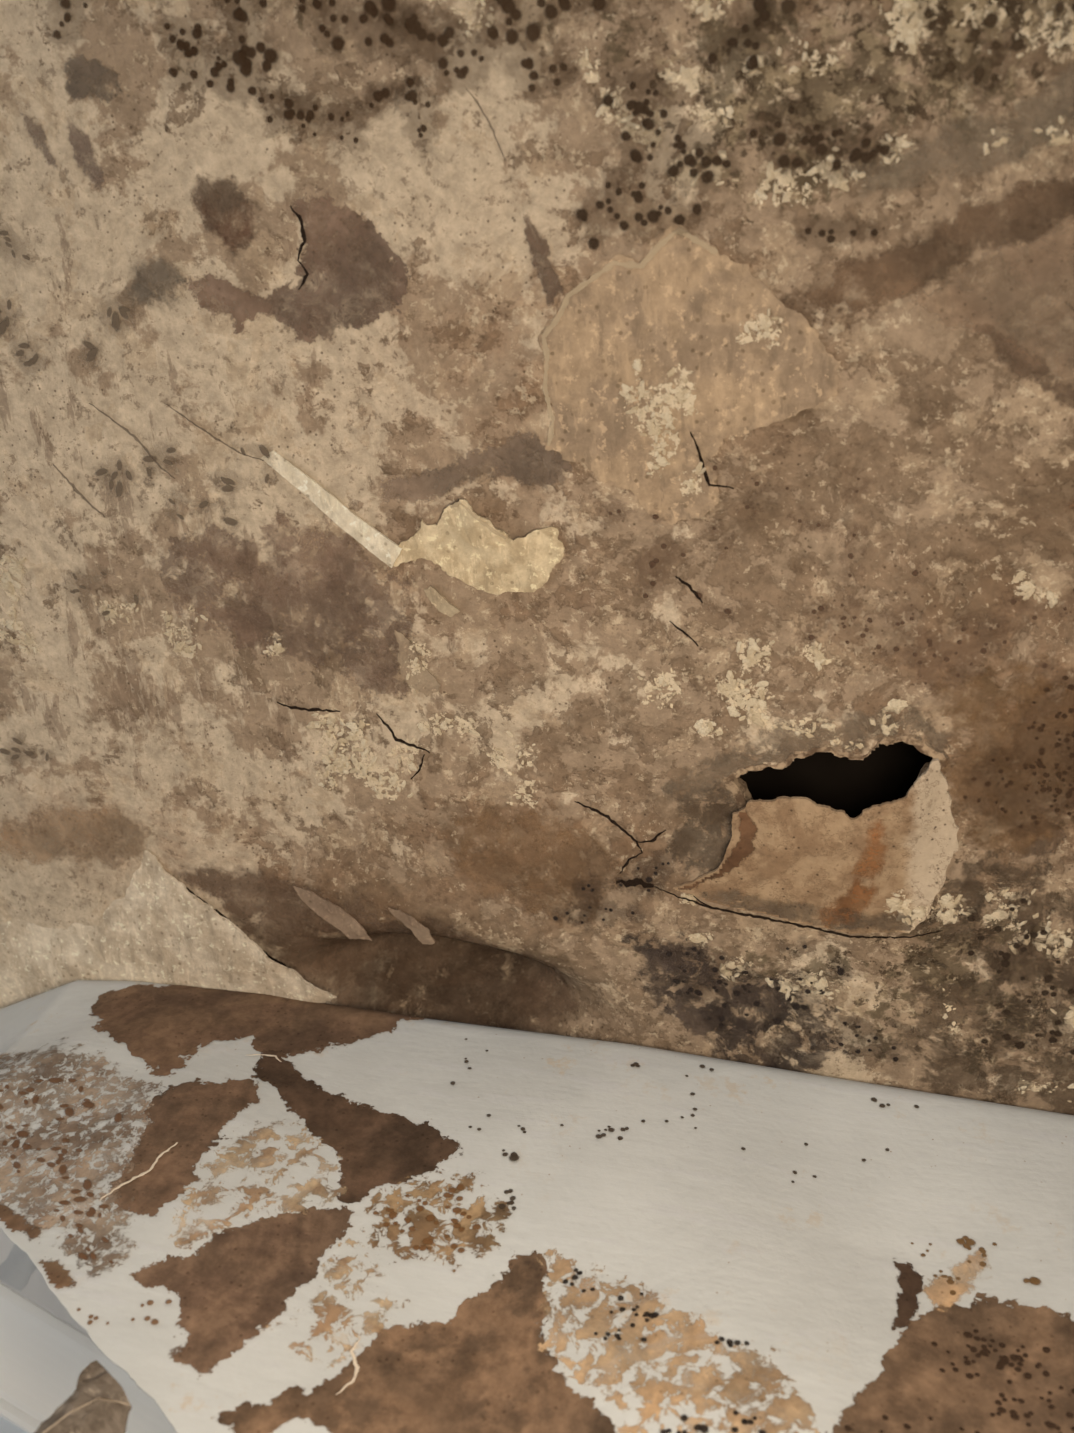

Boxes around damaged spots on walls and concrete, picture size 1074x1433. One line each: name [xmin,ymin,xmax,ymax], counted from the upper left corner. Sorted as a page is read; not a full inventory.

leakage [164,0,358,143]
leakage [299,0,851,187]
leakage [751,70,1074,207]
leakage [880,0,1074,85]
flaking render [538,223,841,525]
flaking render [261,450,565,595]
flaking render [424,586,460,617]
crack [277,702,340,712]
crack [376,713,430,779]
spalling [740,741,933,818]
crack [575,801,943,939]
leakage [0,869,576,1380]